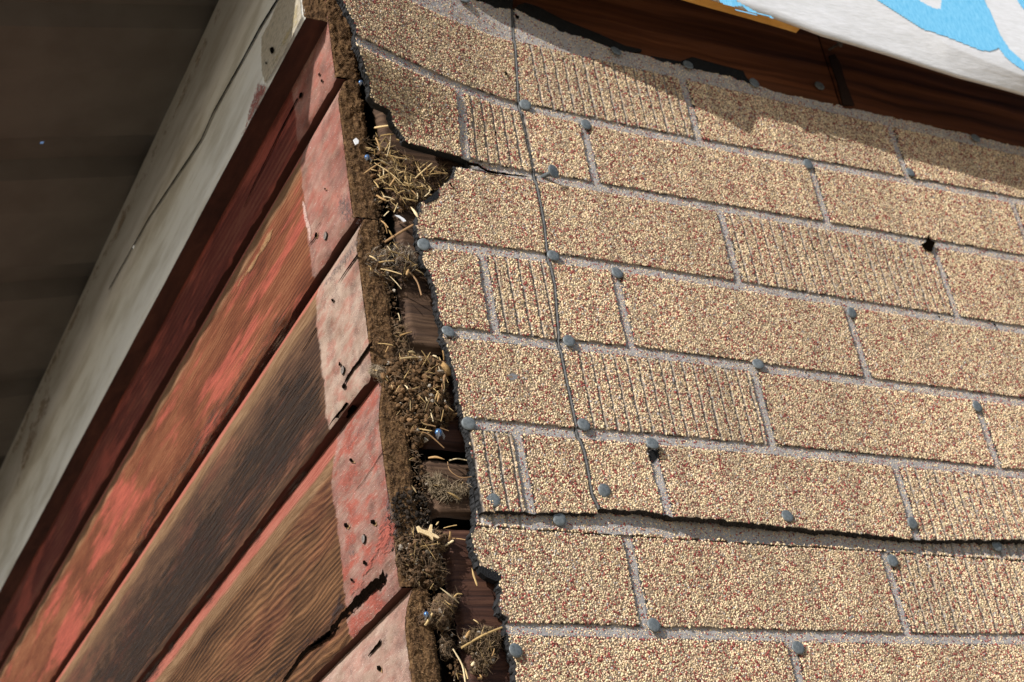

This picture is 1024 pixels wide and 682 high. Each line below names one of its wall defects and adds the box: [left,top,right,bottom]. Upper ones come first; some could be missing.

crack [449,162,529,188]
crack [329,342,373,426]
peeling [352,514,395,593]
crack [282,570,385,682]